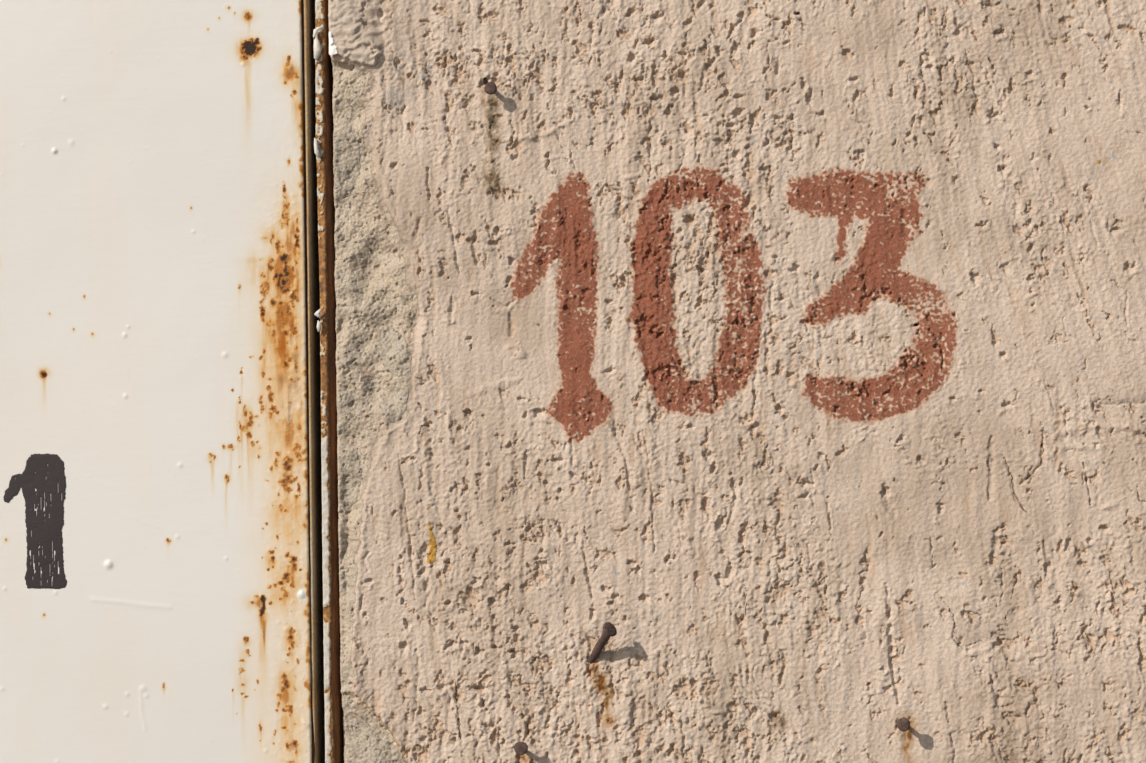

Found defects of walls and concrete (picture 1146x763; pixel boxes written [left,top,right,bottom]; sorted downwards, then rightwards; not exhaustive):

rust [241,38,262,59]
rust [209,185,307,459]
flaking render [313,0,419,763]
rust [270,422,308,526]
rust [251,536,310,632]
rust [259,628,310,763]